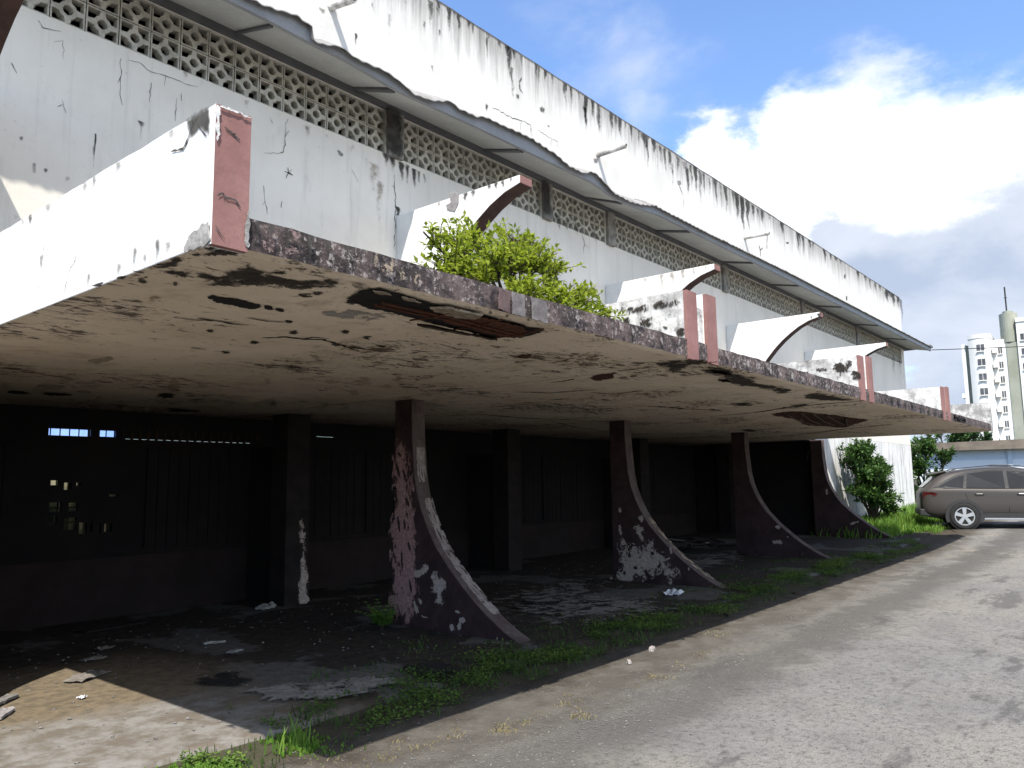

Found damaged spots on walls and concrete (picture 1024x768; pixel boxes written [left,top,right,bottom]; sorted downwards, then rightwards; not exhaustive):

crack [118,60,240,152]
damp [187,108,209,136]
crack [218,118,292,208]
damp [374,107,420,183]
damp [535,65,764,227]
spalling [116,221,232,286]
damp [201,265,345,290]
spalling [322,284,548,346]
damp [616,299,685,337]
damp [780,221,841,261]
peeling [298,518,309,604]
peeling [388,439,752,635]